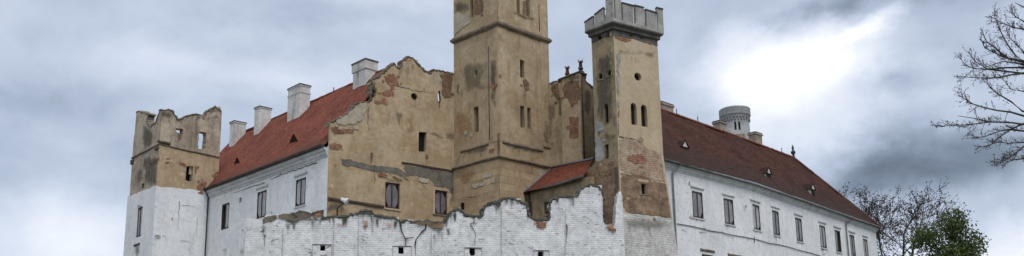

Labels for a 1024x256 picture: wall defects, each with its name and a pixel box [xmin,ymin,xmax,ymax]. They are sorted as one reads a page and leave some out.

flaking render [262,36,670,232]